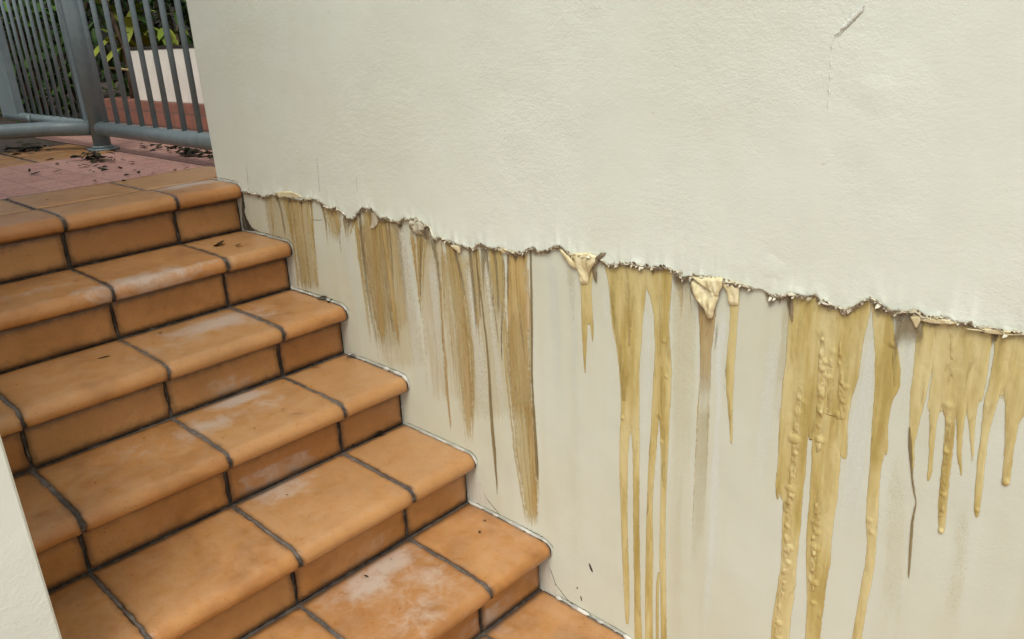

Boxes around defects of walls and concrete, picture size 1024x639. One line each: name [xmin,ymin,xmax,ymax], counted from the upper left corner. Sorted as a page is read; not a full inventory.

spalling [342,319,360,356]
leakage [461,257,506,440]
peeling [241,191,754,319]
peeling [766,292,1024,339]
spalling [468,471,490,504]
leakage [581,265,740,639]
leakage [751,296,1024,639]
spalling [540,559,562,597]